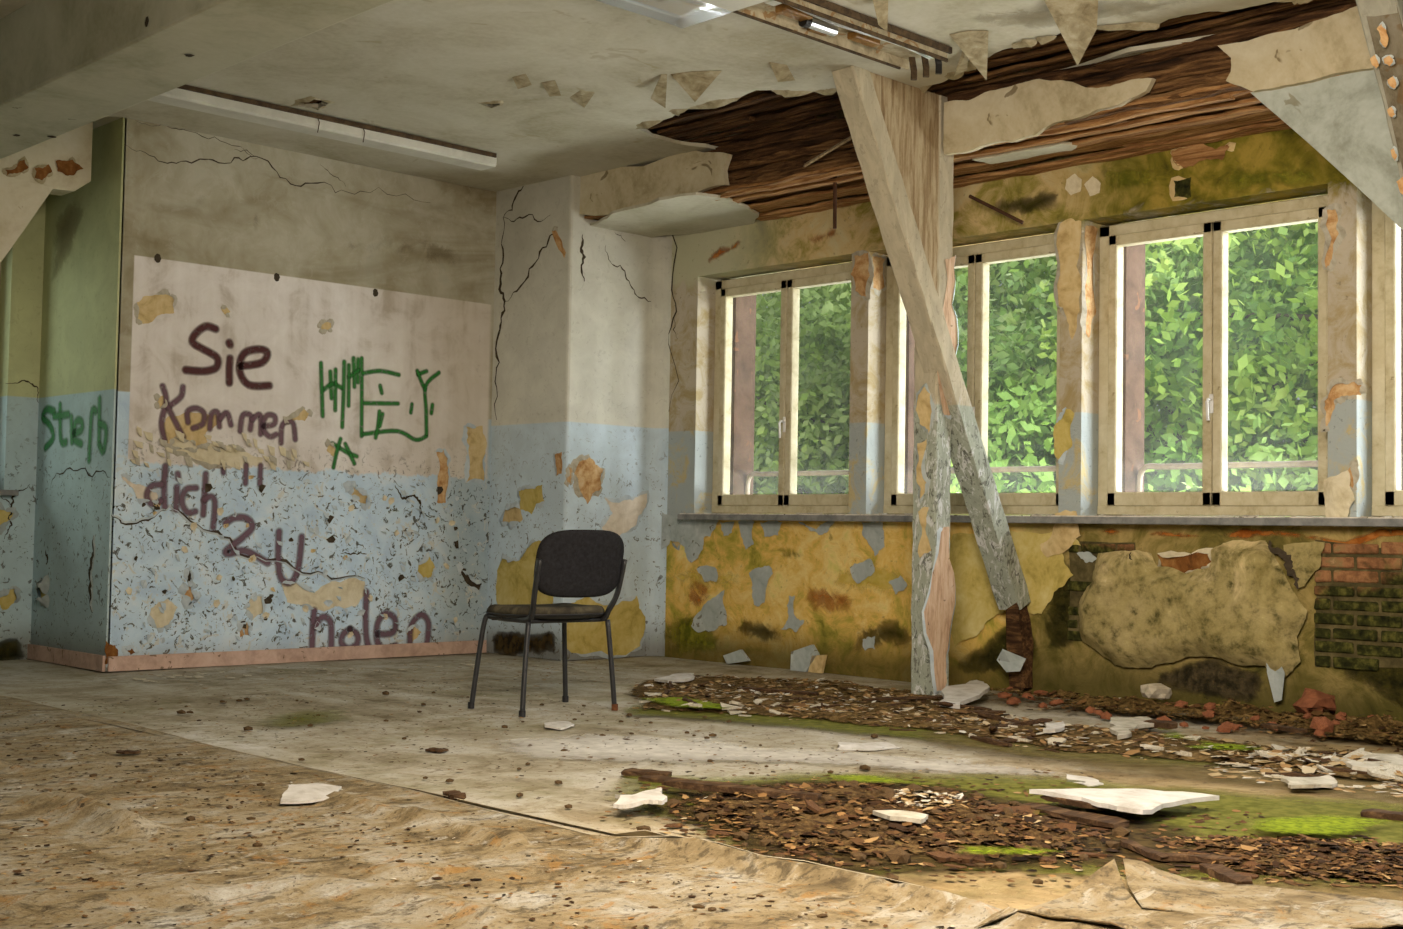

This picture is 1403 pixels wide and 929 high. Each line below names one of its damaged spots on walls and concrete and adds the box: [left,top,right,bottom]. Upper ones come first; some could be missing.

peeling [944,31,988,80]
peeling [636,71,741,129]
peeling [2,156,84,184]
crack [124,120,430,203]
crack [494,187,679,420]
peeling [121,393,313,643]
peeling [233,423,554,641]
peeling [500,452,649,536]
peeling [567,595,646,659]
flaking render [1067,541,1136,641]
flaking render [1314,540,1403,671]
flaking render [1158,659,1285,702]